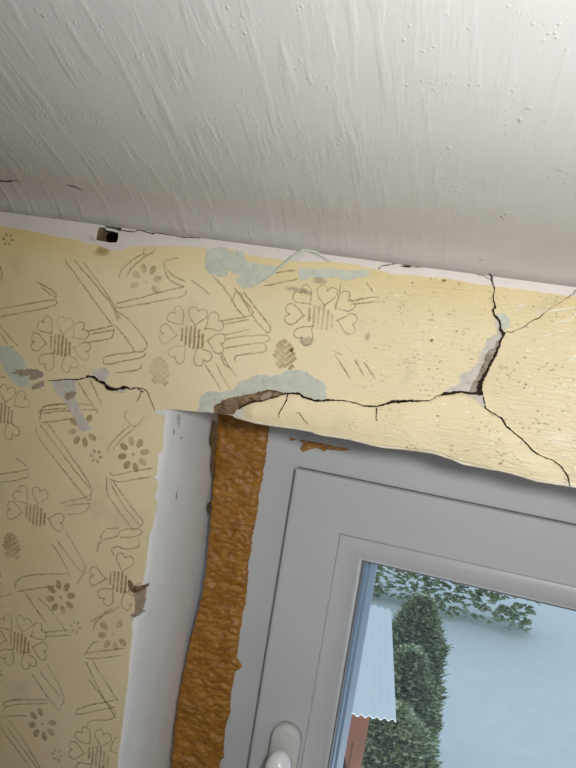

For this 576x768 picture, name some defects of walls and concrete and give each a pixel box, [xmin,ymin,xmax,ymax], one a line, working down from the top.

spalling [92,224,124,246]
peeling [205,247,370,289]
spalling [0,345,92,432]
crack [48,375,155,410]
spalling [198,369,327,481]
crack [239,273,576,487]
spalling [446,313,511,407]
spalling [128,581,149,618]